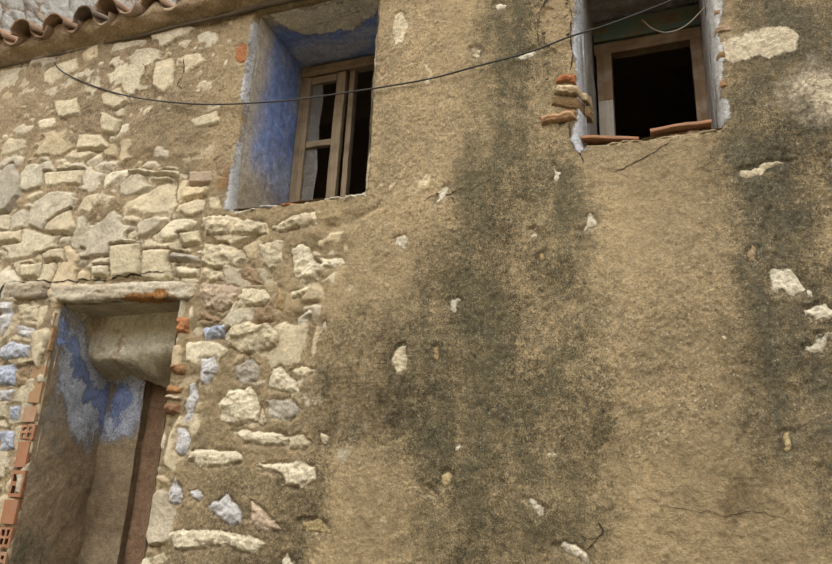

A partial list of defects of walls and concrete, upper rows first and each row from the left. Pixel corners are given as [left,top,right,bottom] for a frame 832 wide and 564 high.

flaking render [539,0,594,153]
peeling [705,0,799,130]
crack [614,139,674,172]
crack [0,271,177,297]
spalling [175,22,345,468]
damp [314,0,624,564]
damp [704,0,832,538]
spalling [769,268,832,320]
peeling [0,302,43,420]
peeling [54,311,145,451]
spalling [168,478,282,554]
spalling [256,460,316,489]